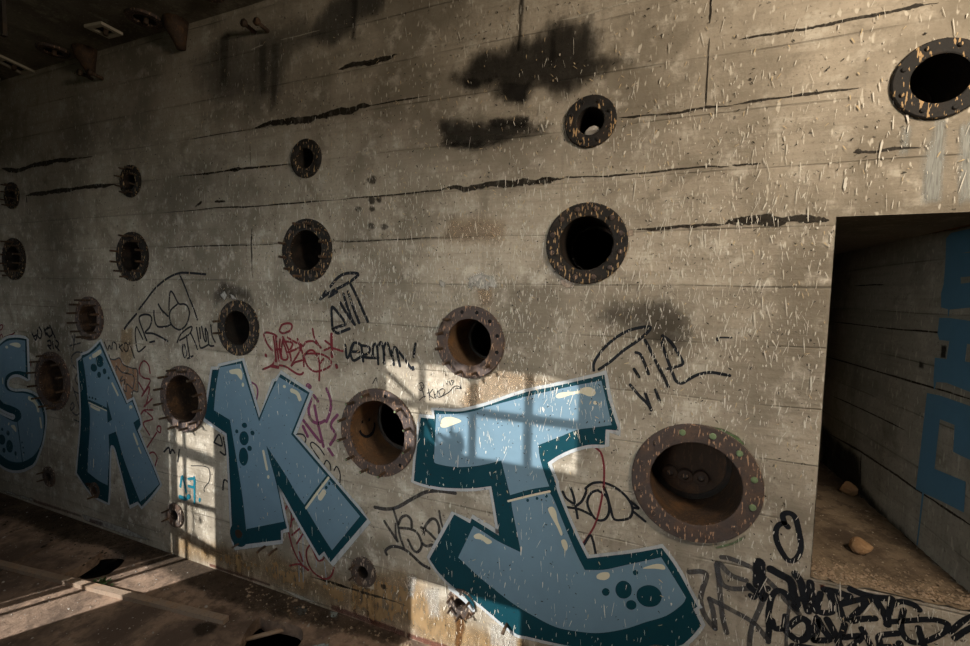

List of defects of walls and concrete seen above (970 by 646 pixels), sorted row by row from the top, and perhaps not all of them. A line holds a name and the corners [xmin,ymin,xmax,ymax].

damp [452,0,616,103]
crack [194,95,431,139]
damp [440,117,542,148]
crack [183,156,287,176]
crack [165,163,761,277]
crack [634,213,829,231]